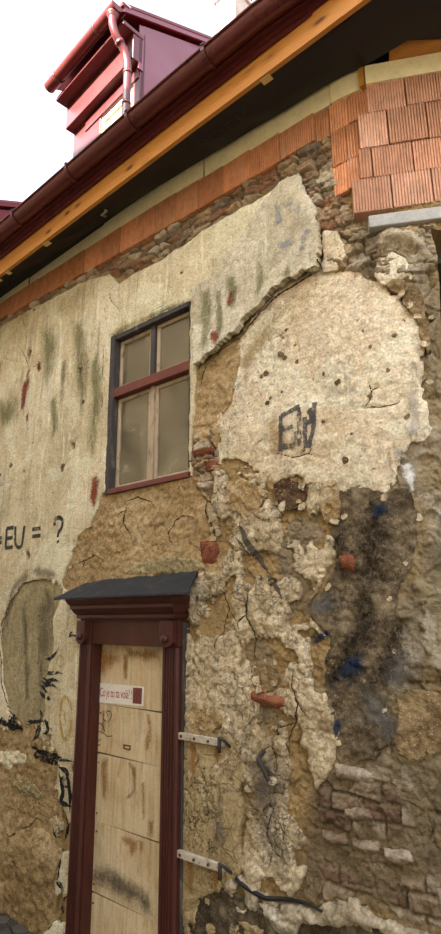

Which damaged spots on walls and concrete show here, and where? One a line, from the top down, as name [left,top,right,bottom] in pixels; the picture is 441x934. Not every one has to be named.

leakage [43,331,53,371]
leakage [75,327,101,453]
flaking render [192,339,241,442]
crack [119,496,154,542]
crack [168,487,265,674]
flaking render [225,478,441,763]
flaking render [0,467,224,934]
crack [264,674,307,772]
crack [0,772,46,864]
crack [266,802,285,869]
flaking render [182,888,279,934]
flaking render [298,923,384,934]